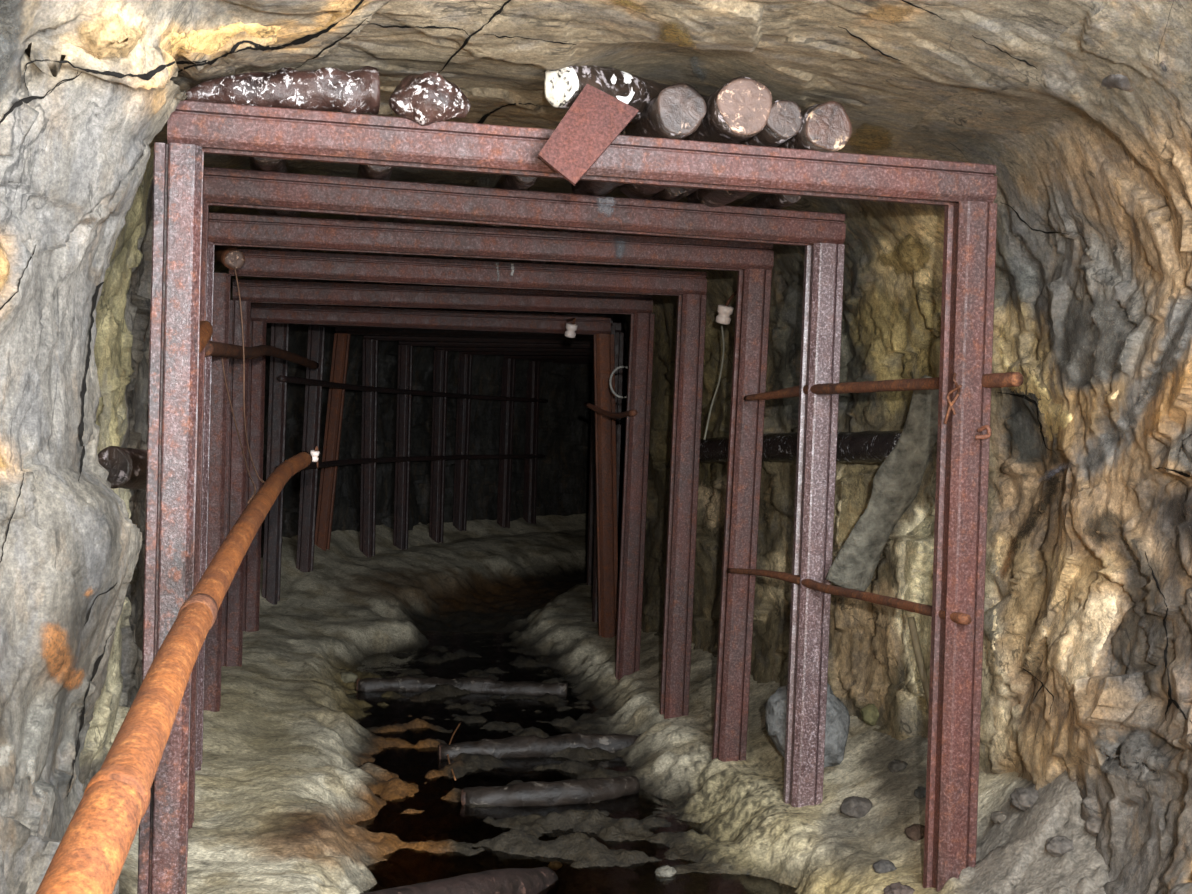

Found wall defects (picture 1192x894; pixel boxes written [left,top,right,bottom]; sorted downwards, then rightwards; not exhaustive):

corrosion [43,625,84,689]